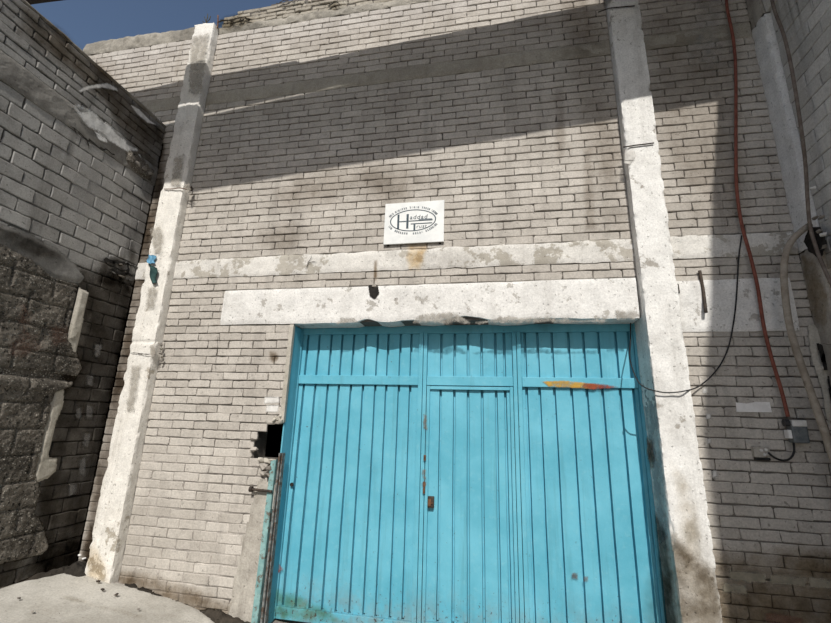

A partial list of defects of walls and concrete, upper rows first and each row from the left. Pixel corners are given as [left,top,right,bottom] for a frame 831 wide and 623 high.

peeling [75,105,154,181]
spalling [368,275,379,299]
spalling [0,223,89,564]
spalling [250,438,277,477]
water stain [656,518,675,623]